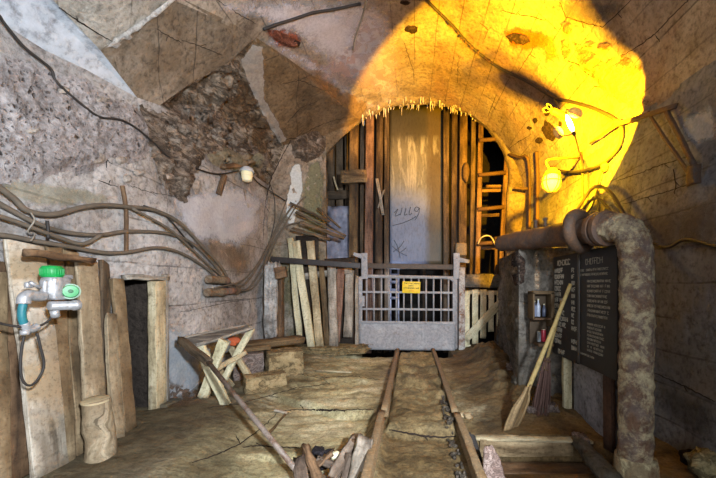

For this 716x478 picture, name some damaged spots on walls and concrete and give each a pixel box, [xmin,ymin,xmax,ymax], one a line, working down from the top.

spalling [506,33,530,45]
spalling [0,55,277,203]